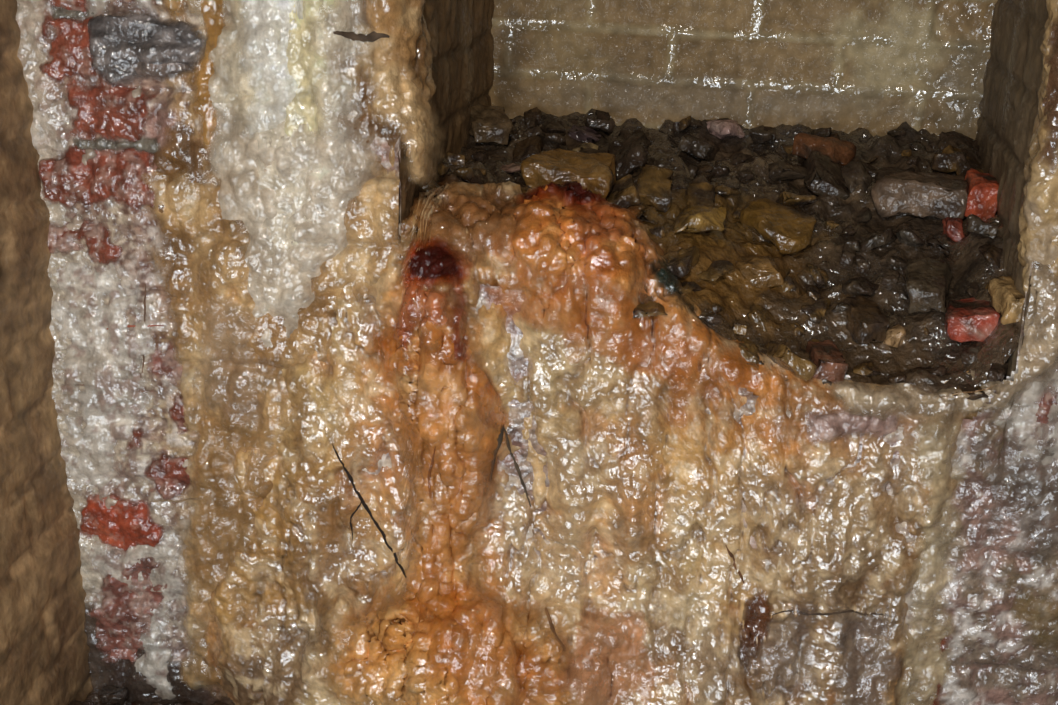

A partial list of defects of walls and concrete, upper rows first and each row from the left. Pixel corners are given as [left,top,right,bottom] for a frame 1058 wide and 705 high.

leakage [48,262,153,497]
spalling [38,0,205,264]
leakage [84,0,436,705]
crack [332,444,407,578]
corrosion [378,181,620,426]
leakage [202,181,982,705]
leakage [836,0,1058,419]
leakage [1014,600,1058,645]